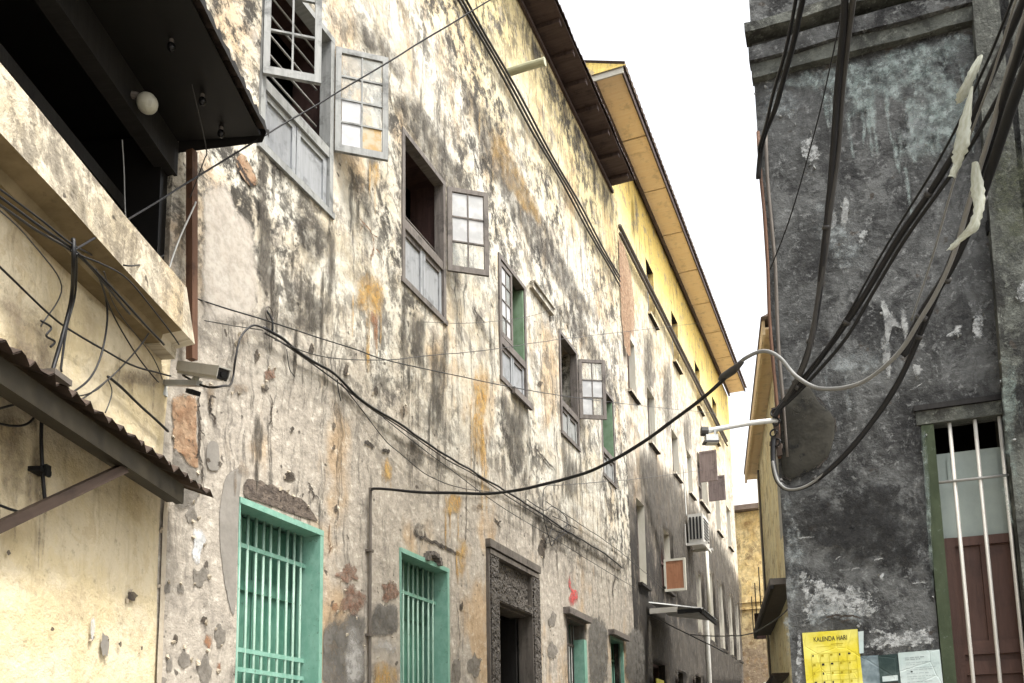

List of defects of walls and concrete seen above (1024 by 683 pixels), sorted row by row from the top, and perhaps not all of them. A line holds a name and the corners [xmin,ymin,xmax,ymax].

spalling [236,154,258,186]
leakage [394,97,469,189]
leakage [808,37,977,197]
leakage [464,72,615,399]
corrosion [352,276,383,363]
flaking render [619,239,635,356]
flaking render [157,382,226,683]
spalling [243,470,318,521]
corrosion [471,376,489,499]
leakage [502,390,531,490]
flaking render [333,563,367,682]
flaking render [382,580,399,603]